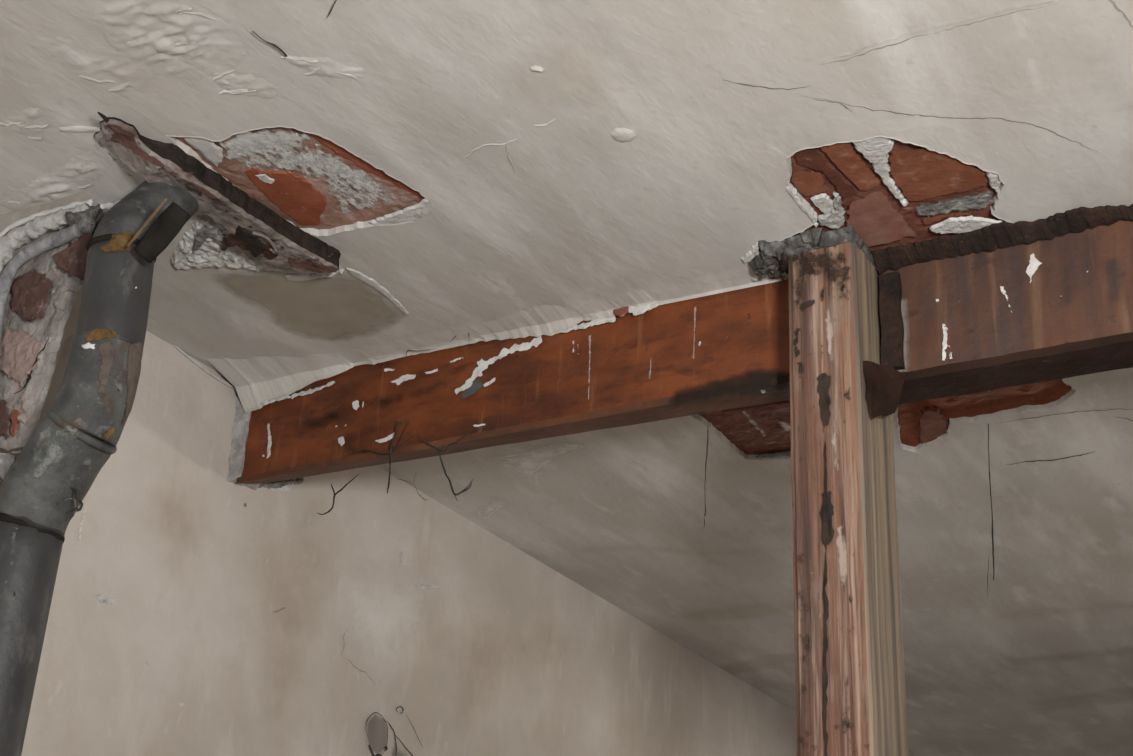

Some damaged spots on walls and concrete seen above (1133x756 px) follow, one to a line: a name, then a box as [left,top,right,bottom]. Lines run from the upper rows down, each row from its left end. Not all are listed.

crack [1109,0,1133,28]
crack [725,3,1092,150]
flaking render [166,125,432,237]
flaking render [779,135,1012,252]
flaking render [170,214,344,277]
flaking render [0,200,120,483]
flaking render [895,379,1077,453]
crack [1001,408,1133,423]
crack [1011,452,1093,465]